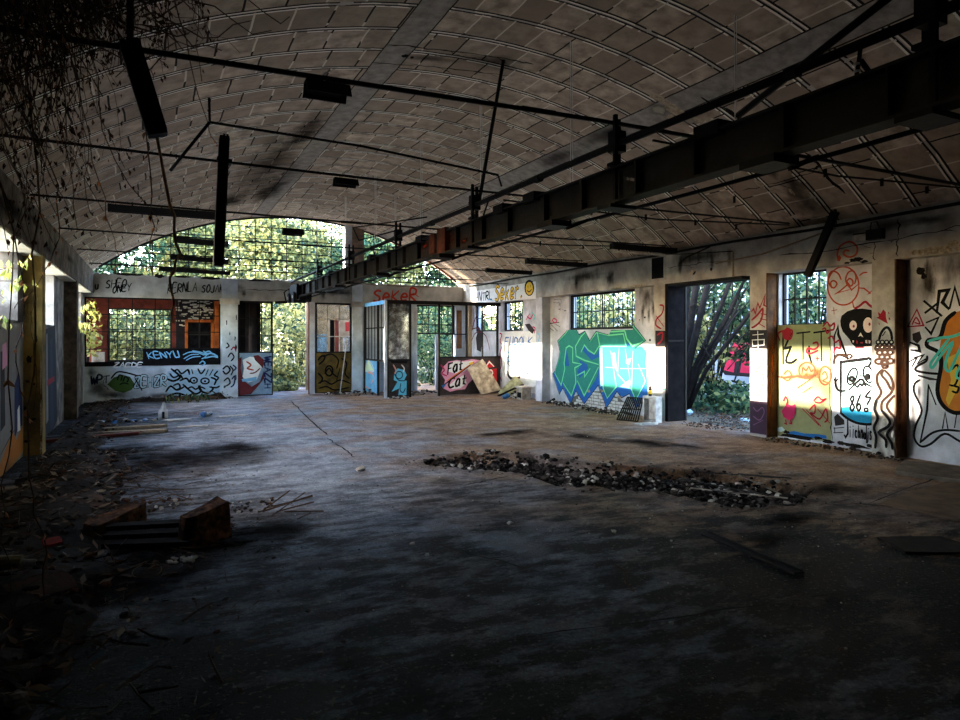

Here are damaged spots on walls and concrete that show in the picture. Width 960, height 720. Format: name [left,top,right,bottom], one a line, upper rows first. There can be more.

leakage [640,288,654,319]
crack [291,401,358,457]